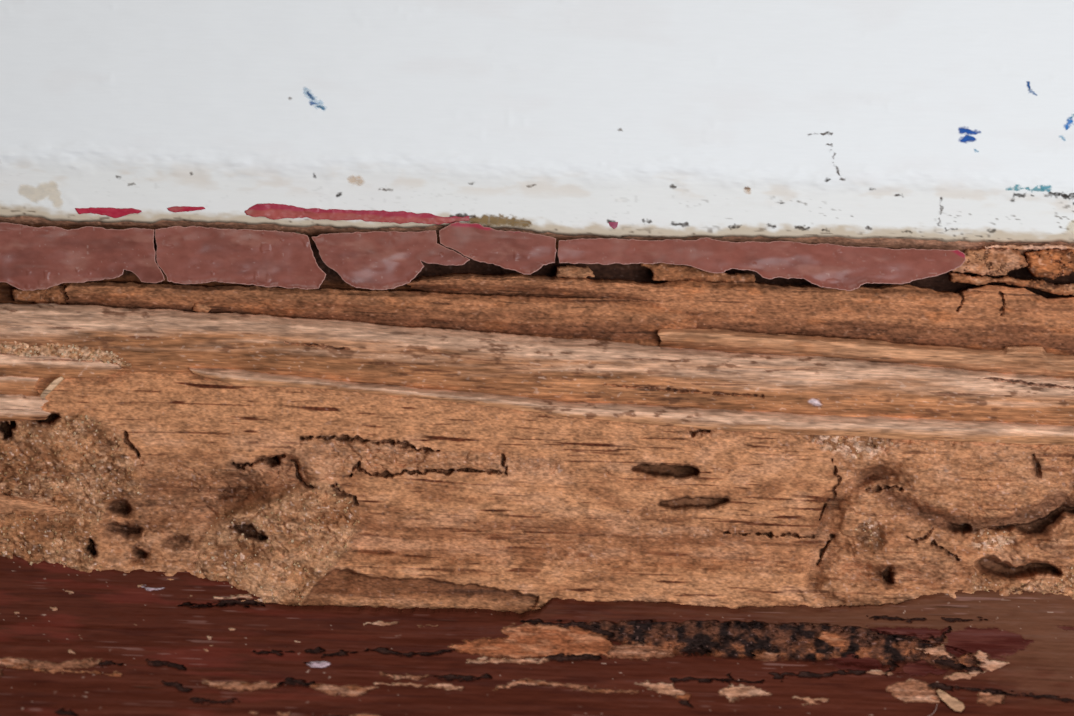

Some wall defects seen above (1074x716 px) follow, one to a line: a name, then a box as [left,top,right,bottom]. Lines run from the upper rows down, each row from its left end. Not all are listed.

peeling [0,222,966,291]
crack [233,435,508,506]
crack [906,527,961,561]
peeling [0,658,123,677]
peeling [146,659,187,671]
spalling [162,569,1074,708]